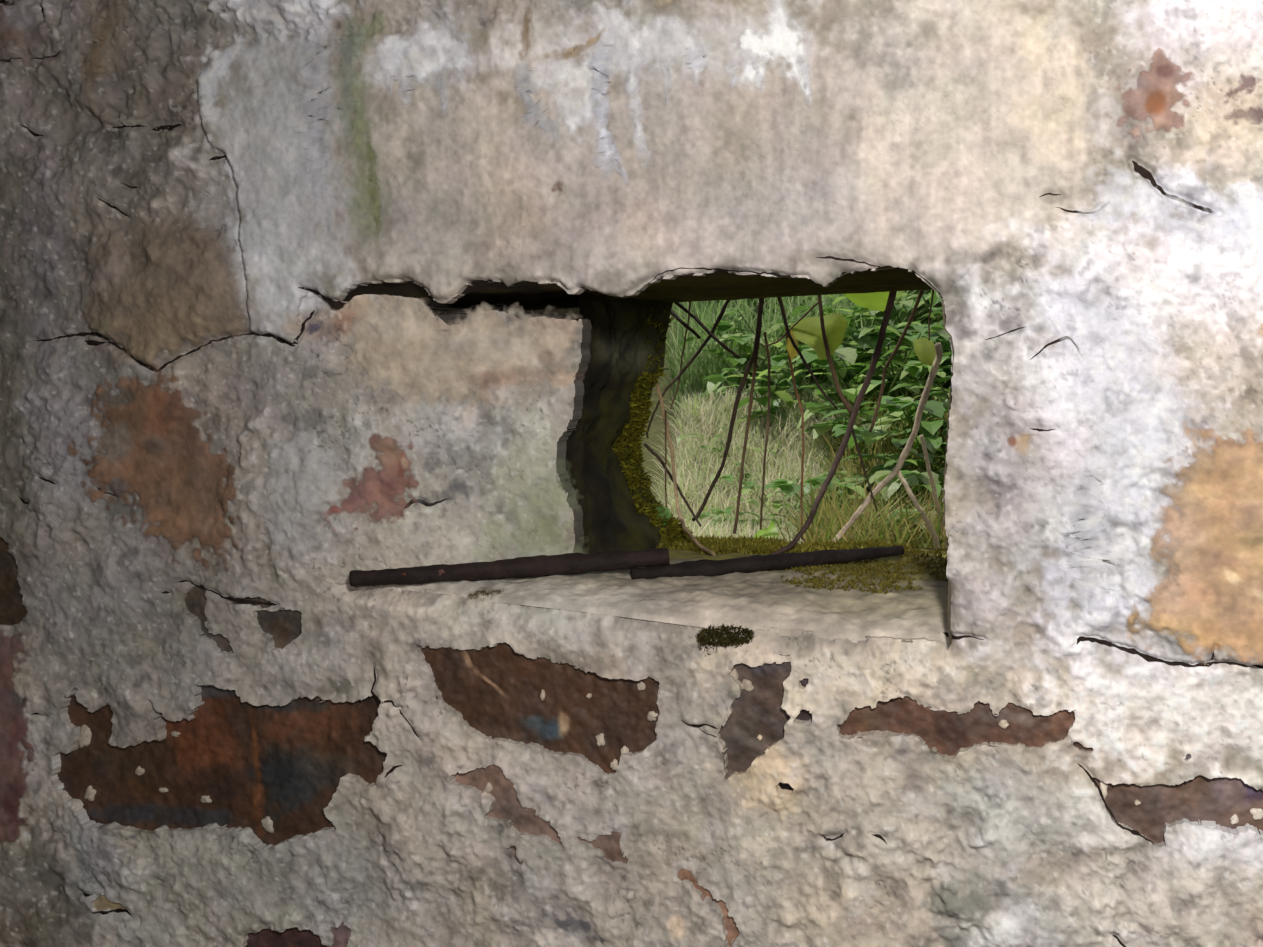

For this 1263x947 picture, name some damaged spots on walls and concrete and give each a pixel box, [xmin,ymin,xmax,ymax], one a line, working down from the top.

water stain [373,8,472,110]
water stain [517,0,705,178]
water stain [726,0,811,100]
crack [98,183,138,217]
crack [1132,160,1215,214]
crack [35,287,345,372]
crack [1077,636,1263,669]
spalling [57,685,387,846]
spalling [420,642,660,774]
spalling [719,654,812,778]
spalling [838,696,1093,756]
spalling [1093,775,1263,844]